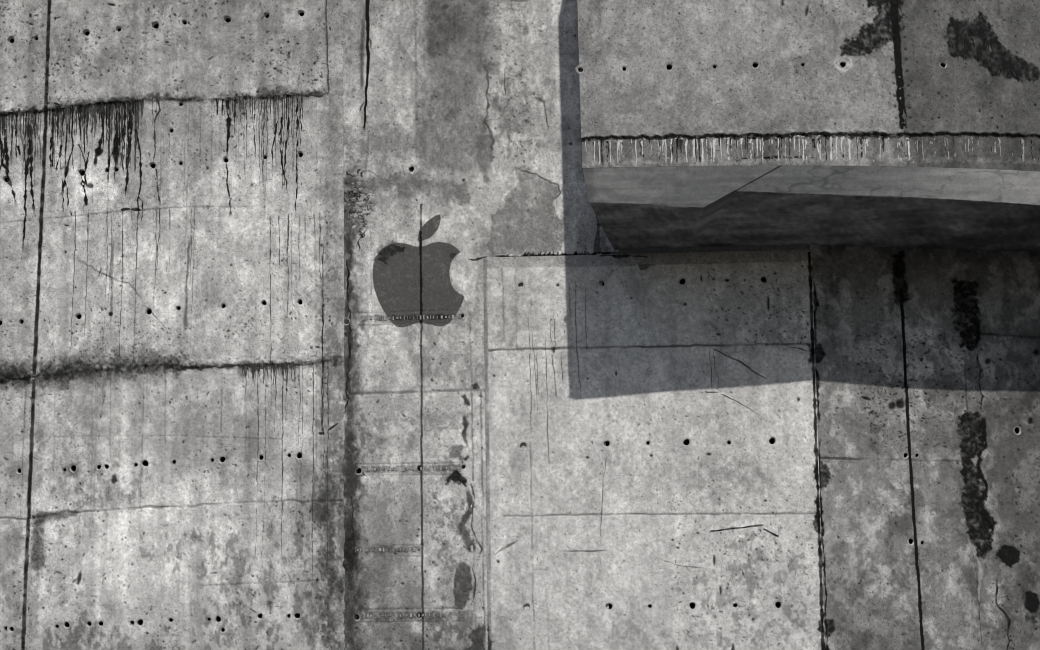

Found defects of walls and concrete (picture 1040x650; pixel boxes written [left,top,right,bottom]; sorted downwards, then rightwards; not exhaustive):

damp [33,511,77,569]
damp [0,91,329,556]